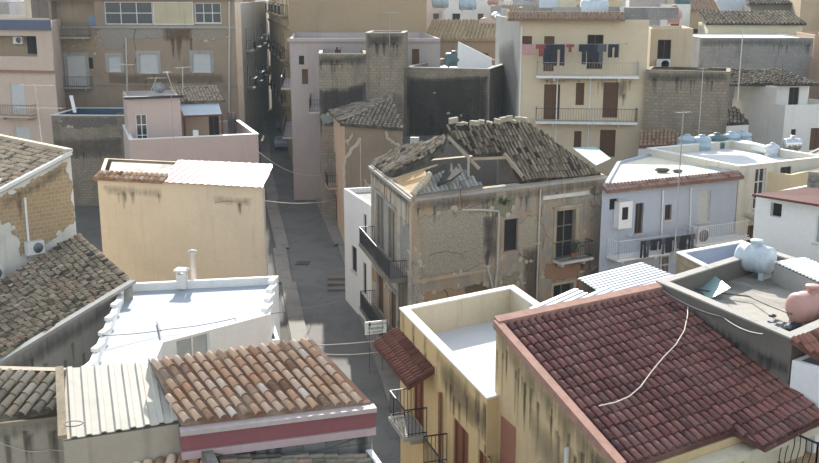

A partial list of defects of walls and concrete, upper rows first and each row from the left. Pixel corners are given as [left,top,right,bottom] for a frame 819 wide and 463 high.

peeling [0,162,75,255]
peeling [400,198,515,305]
peeling [500,214,541,287]
peeling [540,262,599,294]